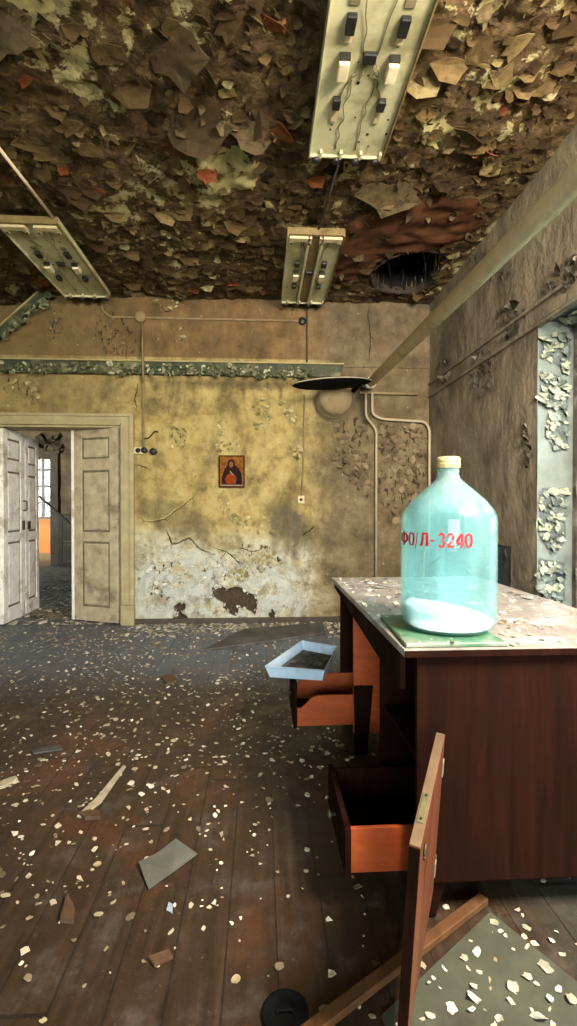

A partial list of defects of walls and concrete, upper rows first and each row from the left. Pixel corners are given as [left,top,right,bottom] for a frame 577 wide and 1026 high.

peeling [0,0,577,311]
peeling [0,232,62,340]
peeling [0,310,316,405]
peeling [496,300,526,341]
peeling [146,562,187,619]
crack [140,492,196,522]
spalling [166,503,281,618]
crack [213,547,262,567]
peeling [534,487,572,605]